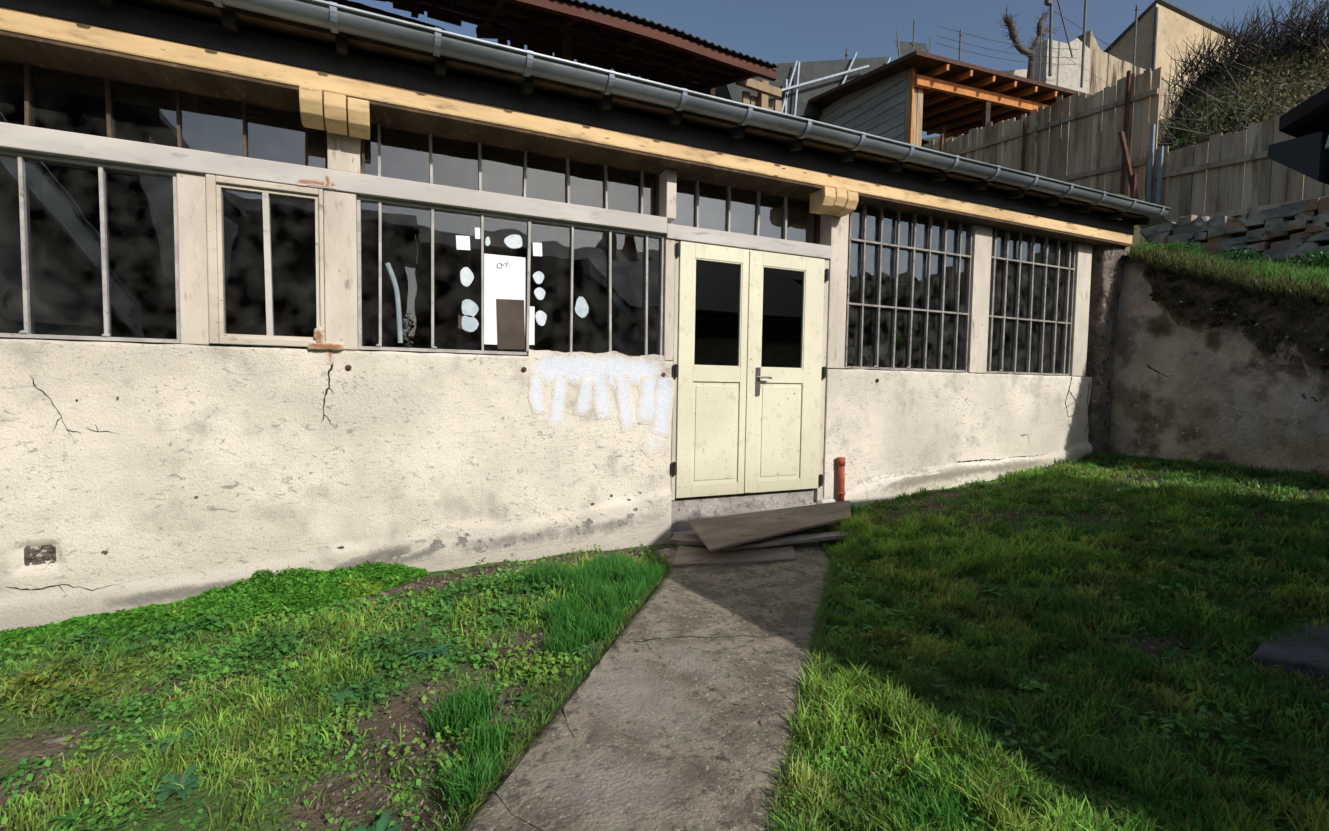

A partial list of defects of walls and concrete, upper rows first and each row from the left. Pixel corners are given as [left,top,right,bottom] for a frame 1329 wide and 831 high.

crack [31,377,120,444]
crack [321,354,335,428]
leakage [683,497,789,520]
crack [8,584,119,595]
leakage [93,505,668,614]